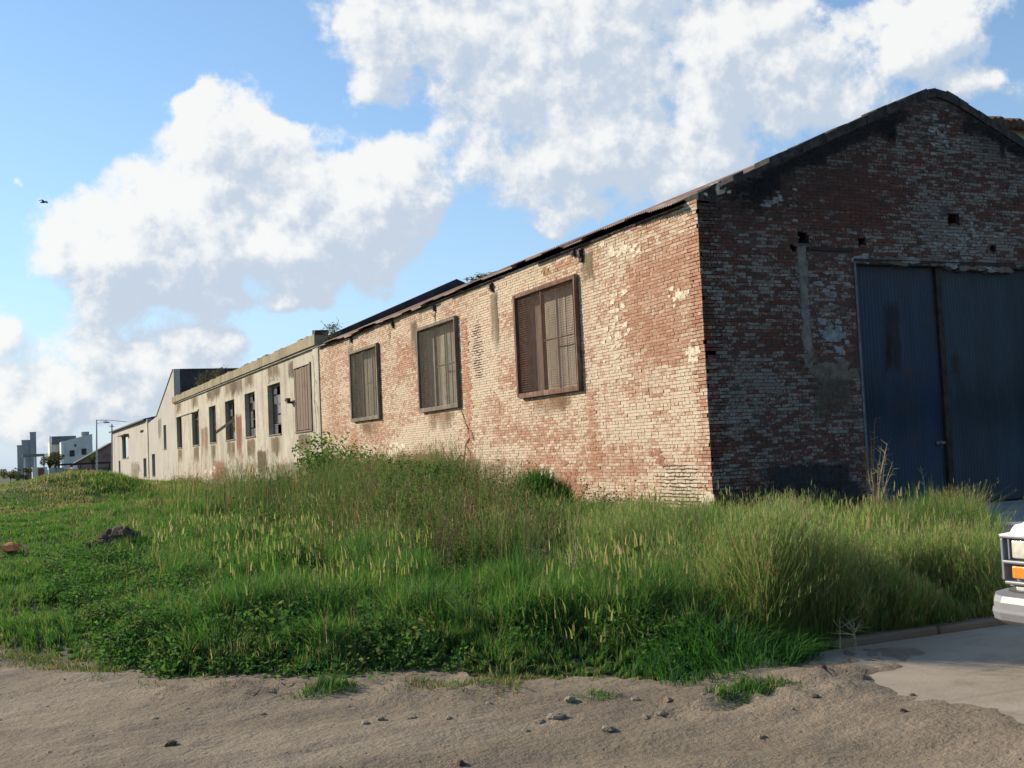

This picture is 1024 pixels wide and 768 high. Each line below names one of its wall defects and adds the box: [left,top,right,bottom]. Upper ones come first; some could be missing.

damp [922,109,1024,158]
damp [736,111,906,221]
peeling [599,241,641,266]
peeling [602,289,631,370]
peeling [668,286,690,308]
peeling [685,345,701,363]
flaking render [812,272,851,356]
damp [701,463,861,510]